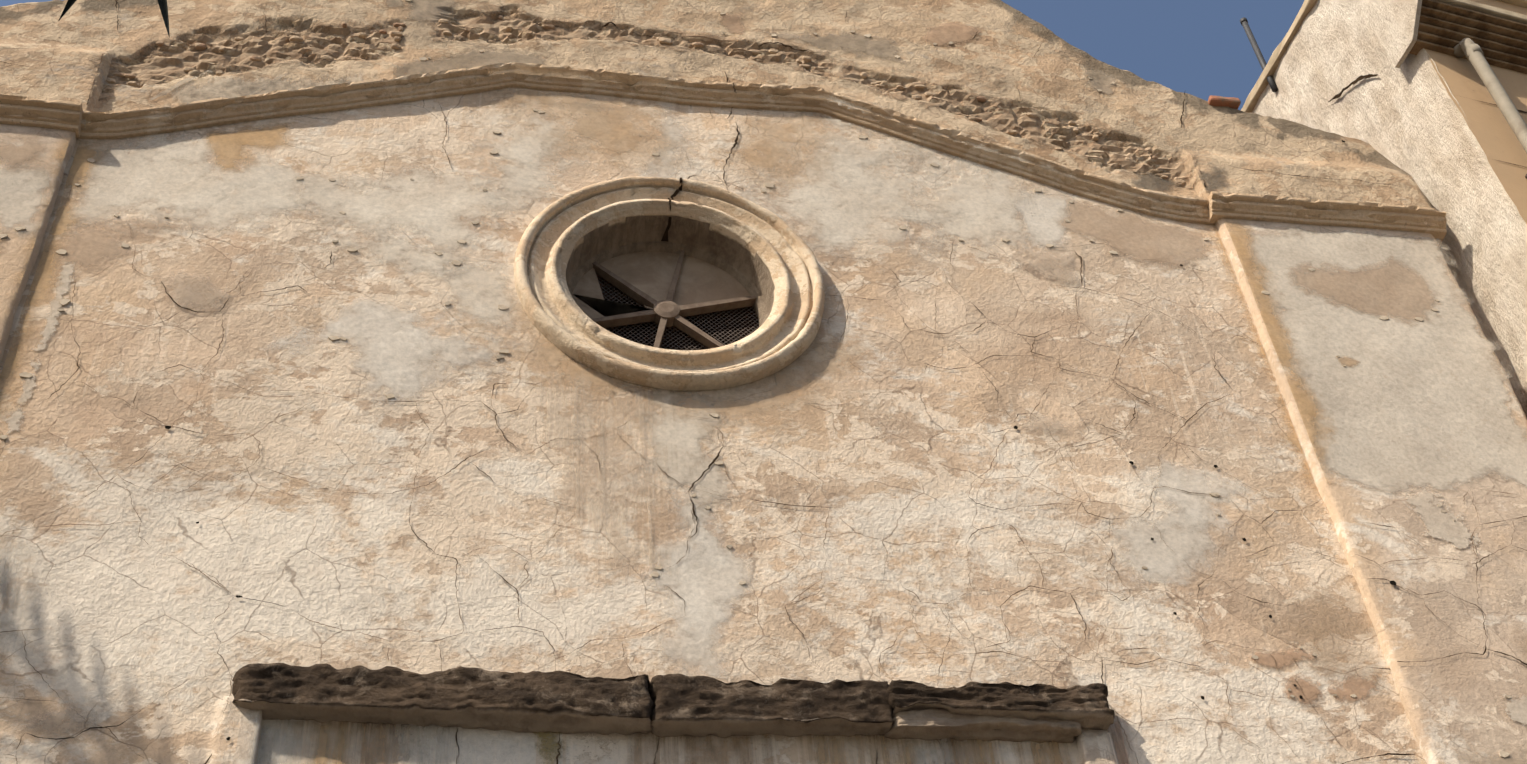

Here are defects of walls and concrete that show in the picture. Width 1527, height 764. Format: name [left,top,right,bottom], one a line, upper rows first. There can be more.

peeling [0,166,48,242]
peeling [68,109,582,327]
spalling [87,0,1197,189]
crack [599,22,703,38]
crack [661,42,812,242]
peeling [742,102,1074,257]
crack [1328,74,1378,102]
crack [0,220,1527,764]